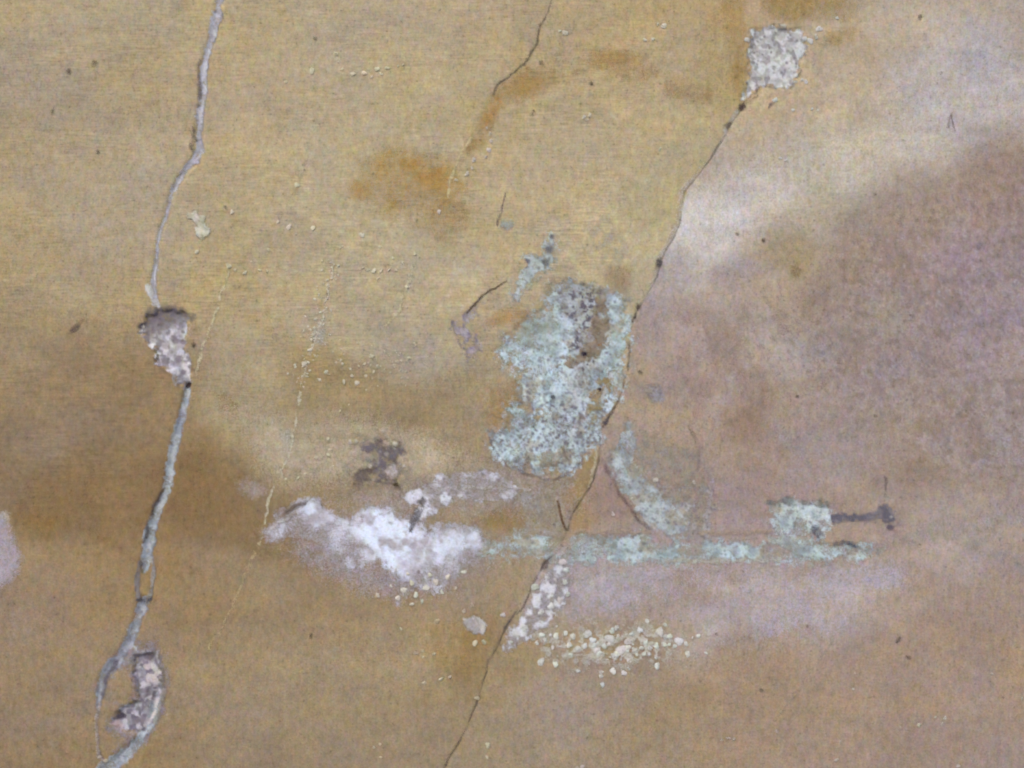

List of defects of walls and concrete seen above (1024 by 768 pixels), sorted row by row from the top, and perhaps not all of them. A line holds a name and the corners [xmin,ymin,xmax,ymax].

crack [145,0,225,309]
crack [494,3,552,92]
flaking render [740,22,823,108]
crack [94,272,230,768]
flaking render [138,304,197,389]
leakage [0,300,595,619]
flaking render [315,427,424,498]
crack [443,94,759,768]
peeling [447,231,1024,687]
flaking render [92,636,171,756]